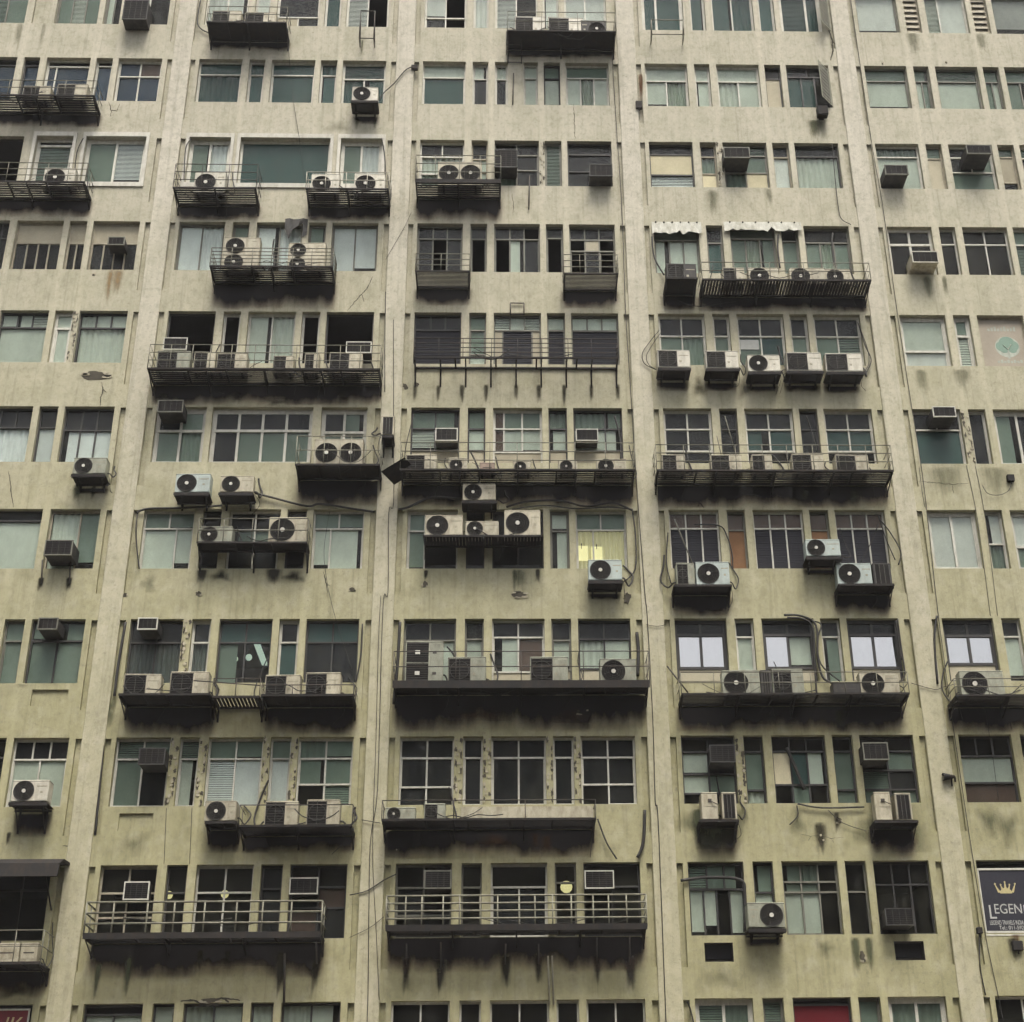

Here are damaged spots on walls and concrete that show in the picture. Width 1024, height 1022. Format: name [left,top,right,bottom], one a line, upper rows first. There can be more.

spalling [81,371,112,380]
water stain [153,385,380,404]
water stain [395,695,646,730]
peeling [195,739,208,807]
water stain [388,936,644,990]
water stain [851,938,872,966]